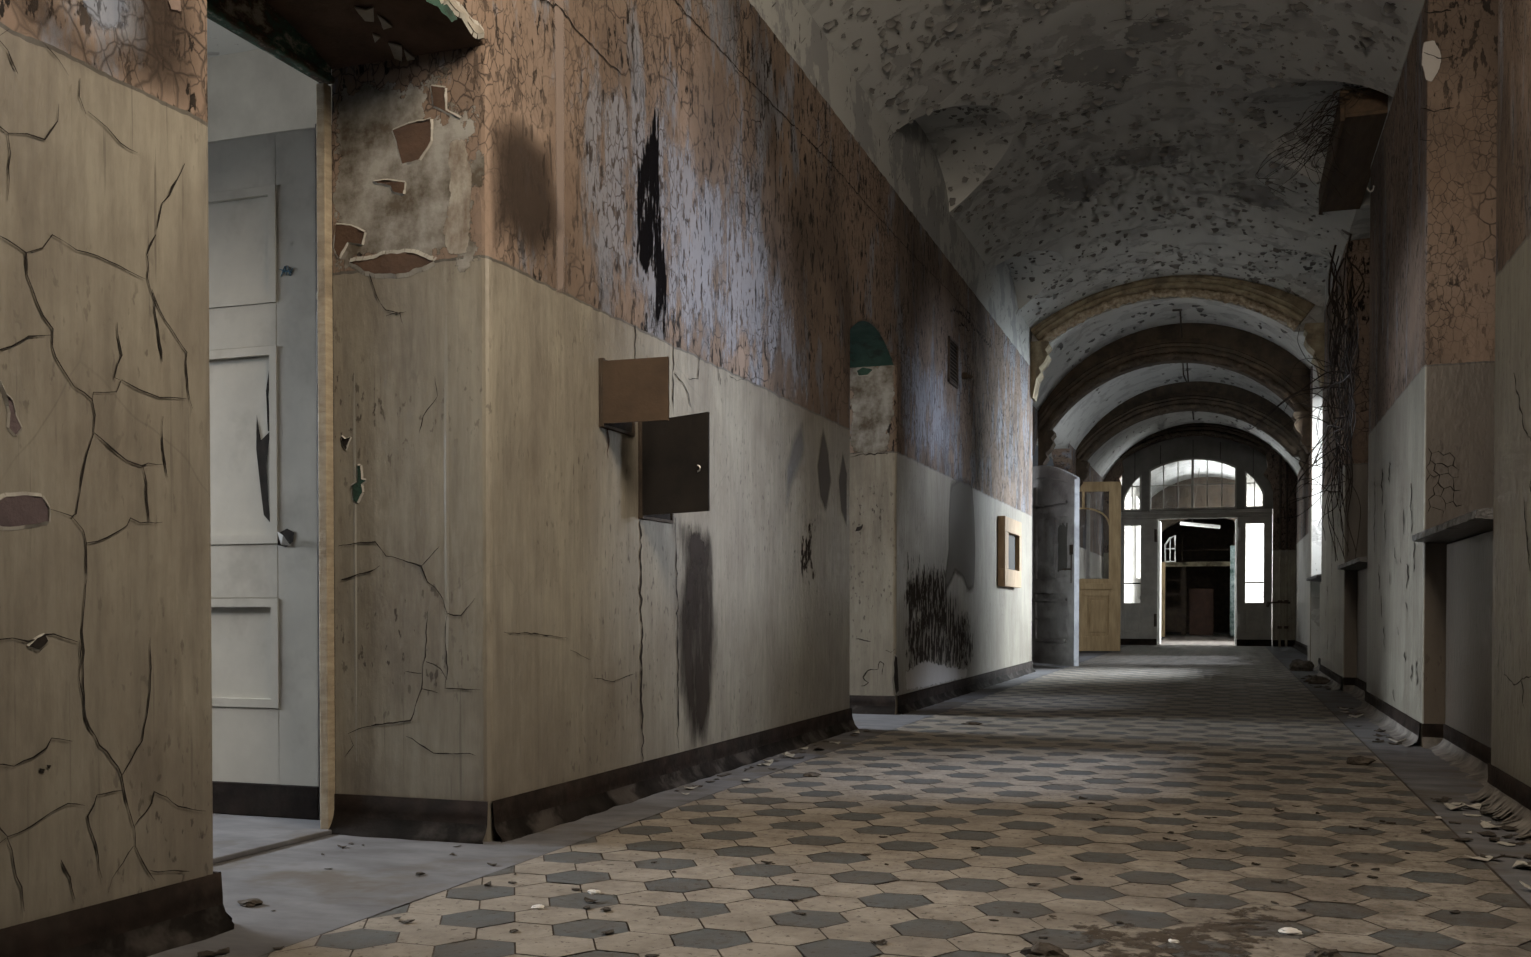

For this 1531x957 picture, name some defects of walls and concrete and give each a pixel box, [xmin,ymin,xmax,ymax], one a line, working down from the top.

peeling [83,0,130,29]
peeling [166,0,182,13]
peeling [355,6,415,62]
spalling [333,54,485,279]
leakage [636,110,667,334]
crack [1514,374,1531,441]
peeling [0,491,51,531]
crack [0,47,202,907]
crack [1523,481,1531,567]
leakage [680,532,713,738]